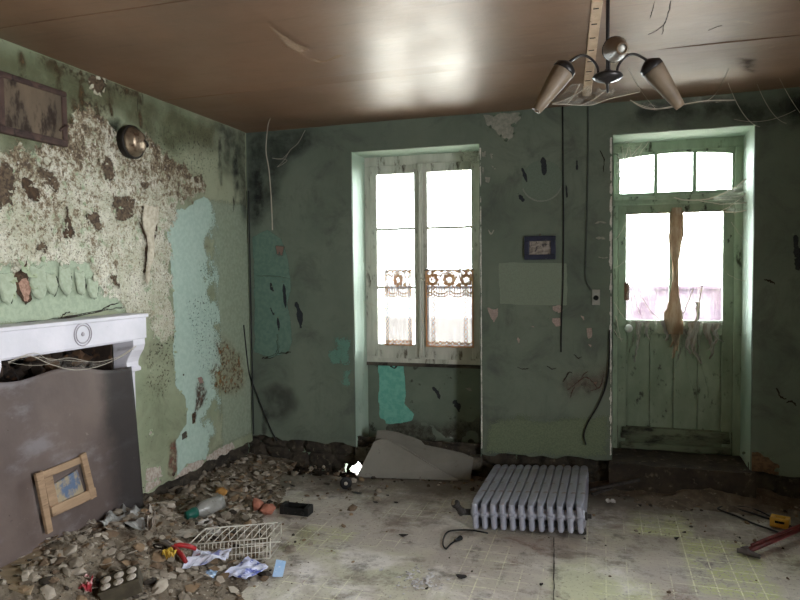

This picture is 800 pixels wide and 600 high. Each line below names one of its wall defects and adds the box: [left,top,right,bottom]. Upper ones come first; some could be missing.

water stain [0,52,306,211]
peeling [477,111,522,142]
peeling [0,101,207,348]
spalling [175,442,235,479]